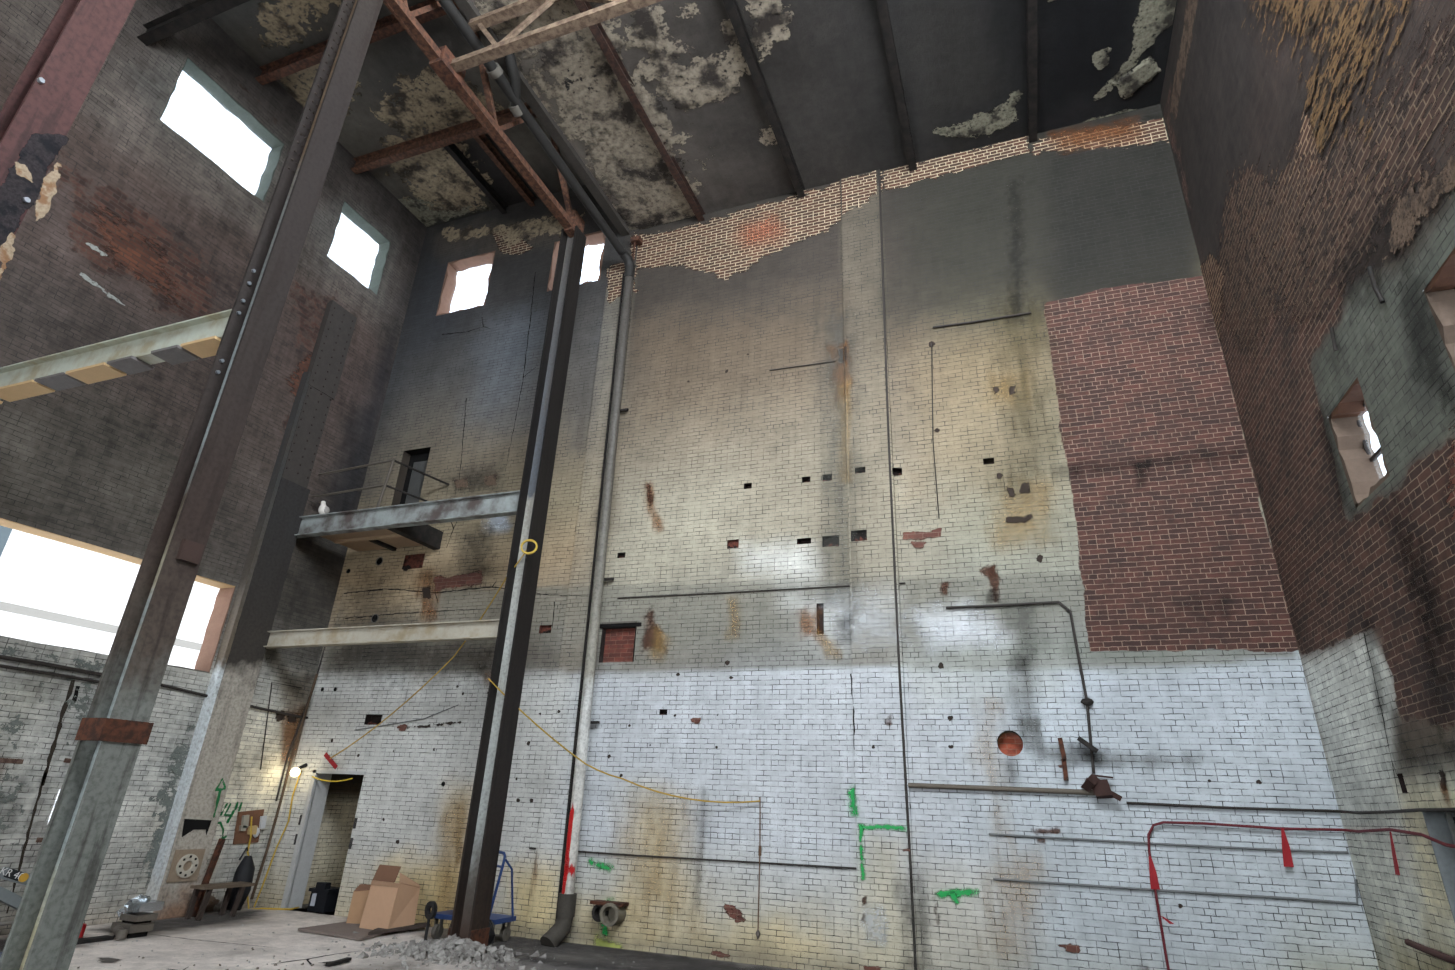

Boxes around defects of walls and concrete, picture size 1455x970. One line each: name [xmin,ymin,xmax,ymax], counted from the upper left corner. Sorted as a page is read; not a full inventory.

peeling [0,133,69,280]
spalling [79,272,125,306]
spalling [86,202,185,310]
flaking render [475,0,1198,304]
spalling [1200,0,1455,363]
rust [647,484,660,526]
peeling [2,643,105,723]
rust [642,609,666,650]
peeling [0,714,35,846]
crack [6,680,80,913]